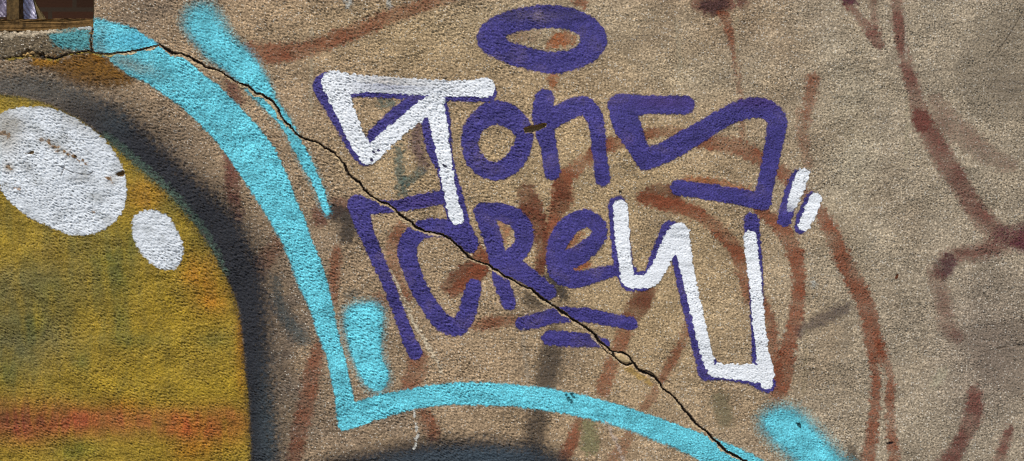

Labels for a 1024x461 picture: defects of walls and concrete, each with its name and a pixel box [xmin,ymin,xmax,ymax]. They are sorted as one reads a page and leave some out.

crack [3,29,747,461]